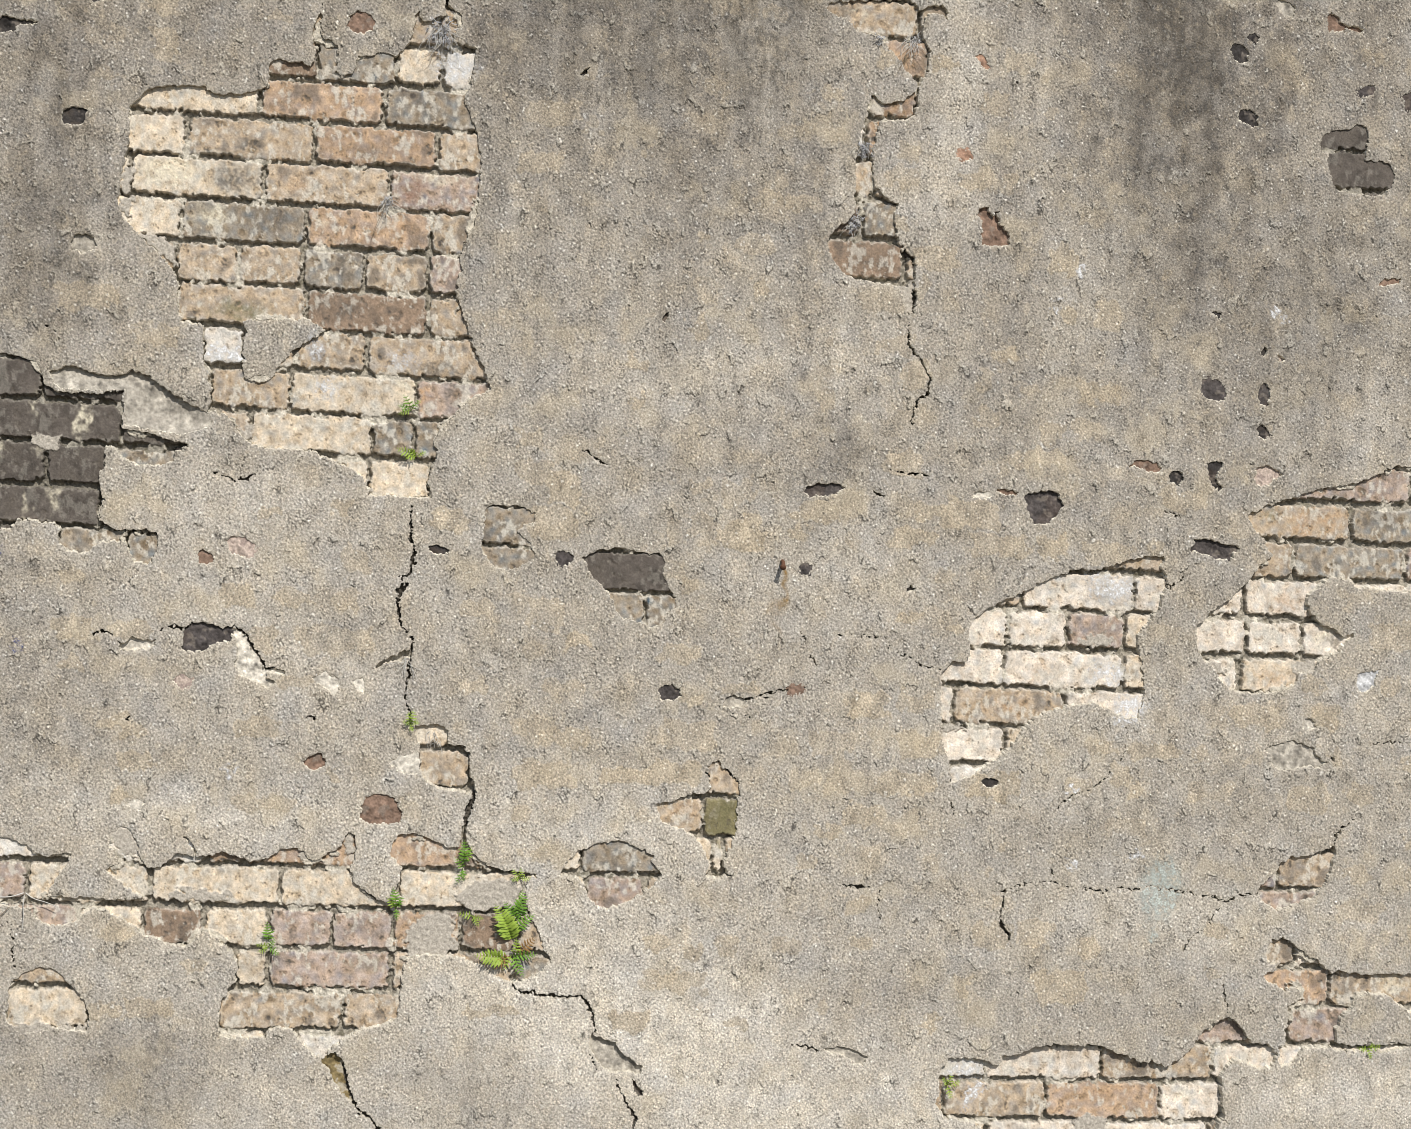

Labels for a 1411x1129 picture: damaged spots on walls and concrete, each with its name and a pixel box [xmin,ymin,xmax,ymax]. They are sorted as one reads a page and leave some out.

spalling [826,0,949,314]
spalling [1320,124,1395,197]
spalling [0,3,491,566]
crack [902,246,932,428]
crack [395,505,417,725]
spalling [481,504,676,629]
spalling [940,556,1169,788]
spalling [1190,461,1411,695]
crack [463,791,476,826]
spalling [0,794,551,1103]
crack [512,983,638,1129]
spalling [935,937,1411,1129]